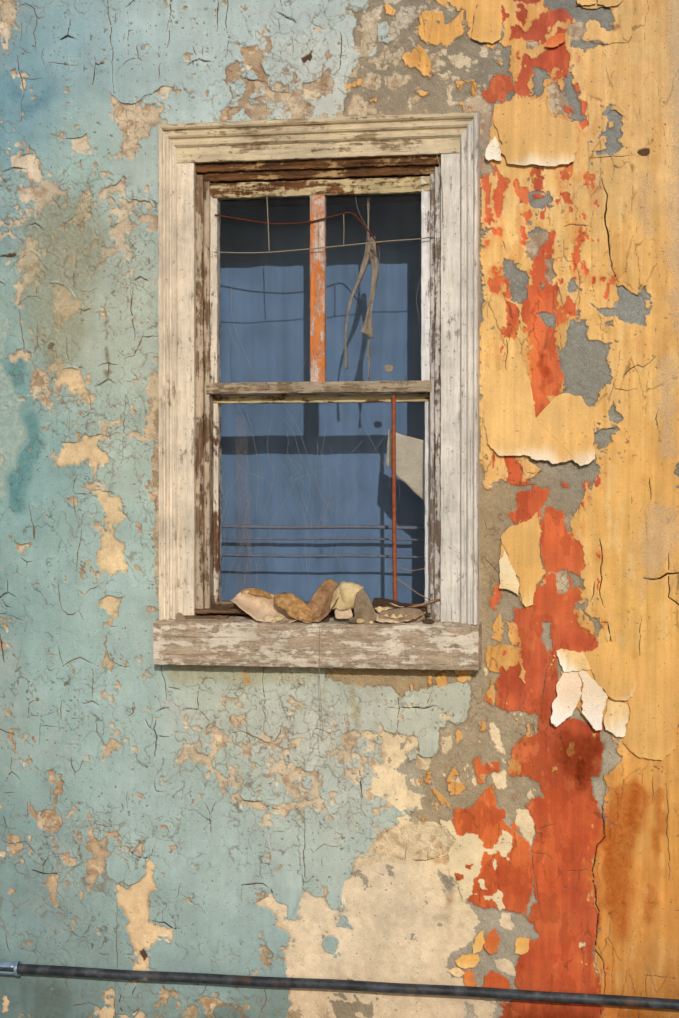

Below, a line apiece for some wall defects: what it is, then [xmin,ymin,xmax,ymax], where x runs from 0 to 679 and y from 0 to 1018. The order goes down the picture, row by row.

crack [17,3,67,122]
crack [107,0,172,93]
crack [217,0,256,60]
peeling [111,82,174,161]
crack [125,291,158,359]
peeling [58,429,126,467]
peeling [93,486,131,619]
peeling [146,371,159,612]
peeling [219,0,679,1018]
crack [643,554,679,606]
crack [129,666,216,754]
peeling [86,821,174,971]